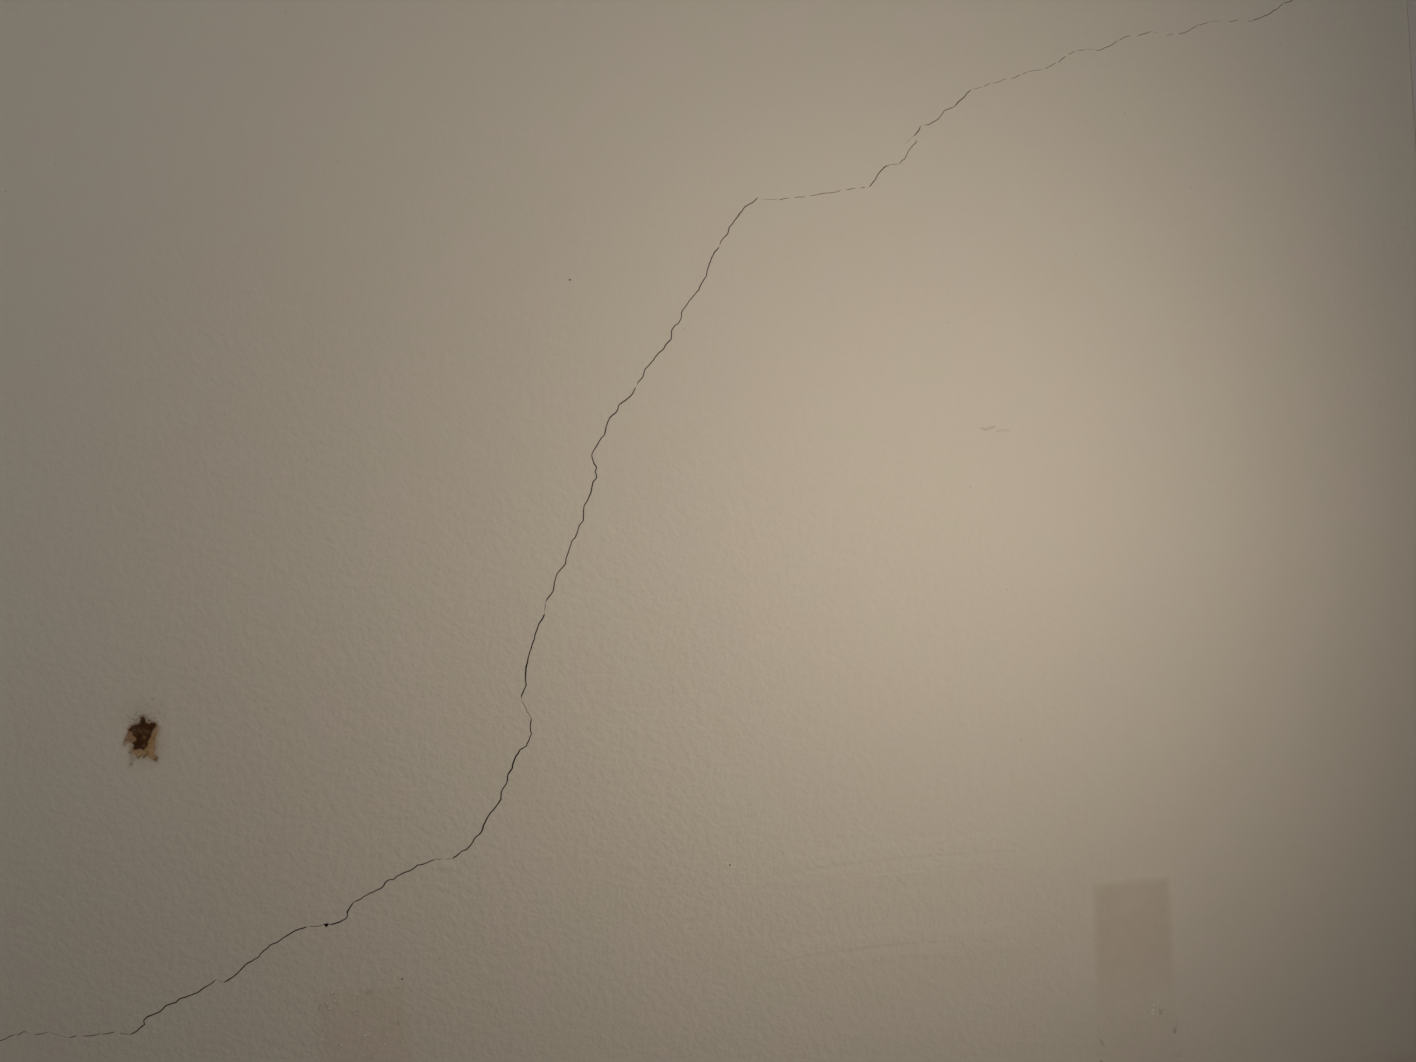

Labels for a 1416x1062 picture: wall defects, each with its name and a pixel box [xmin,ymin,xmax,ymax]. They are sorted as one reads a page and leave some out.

crack [0,71,803,1041]
crack [811,0,1292,196]